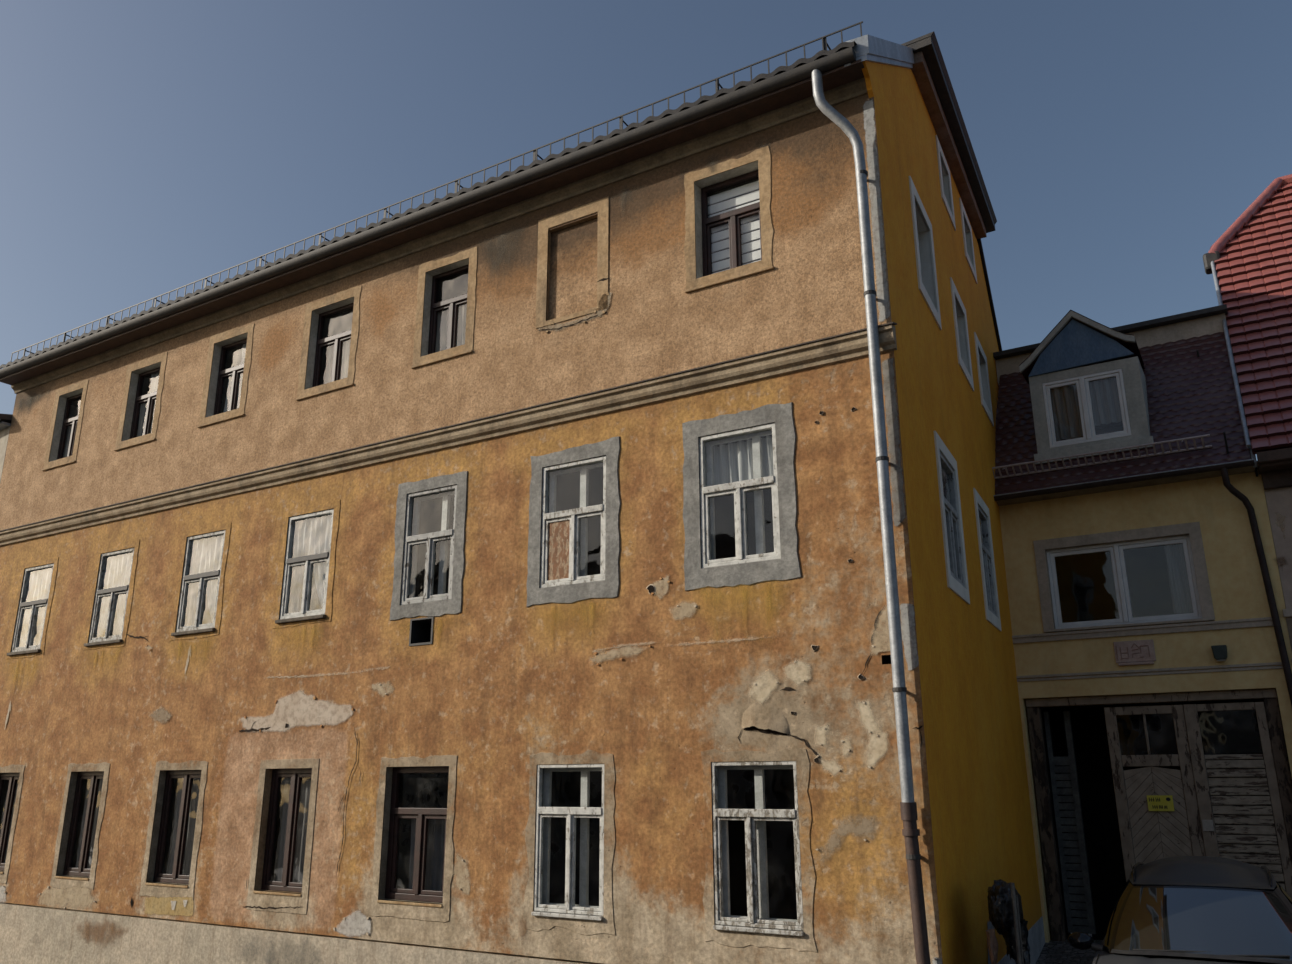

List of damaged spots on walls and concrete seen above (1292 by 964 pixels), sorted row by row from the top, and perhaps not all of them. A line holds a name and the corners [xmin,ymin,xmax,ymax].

peeling [590,645,651,666]
flaking render [750,645,818,703]
flaking render [240,691,354,732]
flaking render [814,726,851,774]
flaking render [858,702,887,768]
crack [336,727,361,876]
flaking render [333,911,371,936]